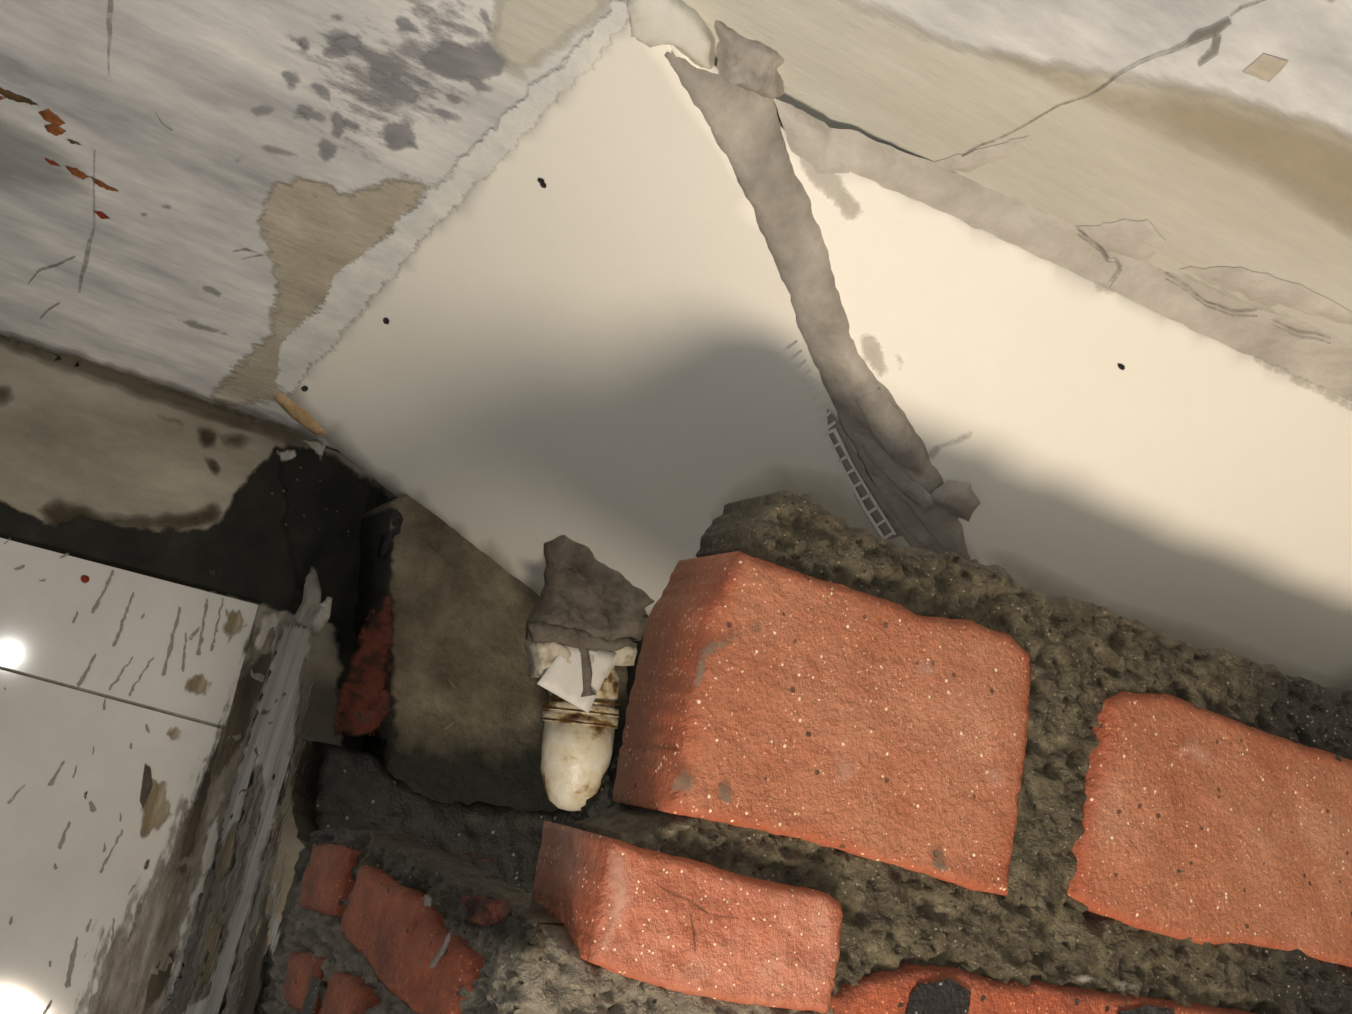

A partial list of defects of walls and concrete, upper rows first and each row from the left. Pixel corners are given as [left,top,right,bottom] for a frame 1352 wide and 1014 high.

leakage [282,4,506,161]
crack [965,0,1266,155]
peeling [1243,54,1289,82]
corrosion [0,88,81,145]
corrosion [45,158,118,192]
leakage [0,334,393,1014]
leakage [627,635,644,700]